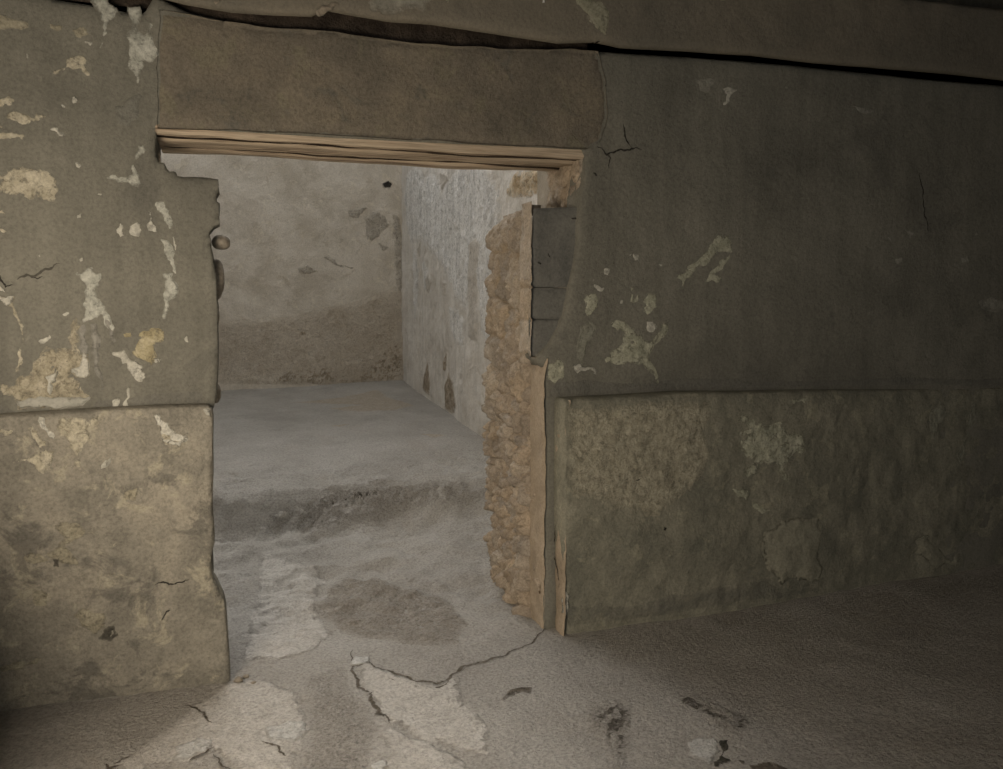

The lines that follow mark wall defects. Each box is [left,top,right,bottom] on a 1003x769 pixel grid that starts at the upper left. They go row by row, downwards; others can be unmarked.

spalling [0,96,46,140]
spalling [0,166,58,202]
flaking render [116,201,173,237]
crack [598,124,640,167]
crack [17,263,60,280]
spalling [0,276,100,474]
spalling [111,328,164,406]
spalling [605,286,668,383]
spalling [565,397,712,517]
spalling [733,414,805,514]
crack [350,628,546,723]
crack [106,756,130,769]